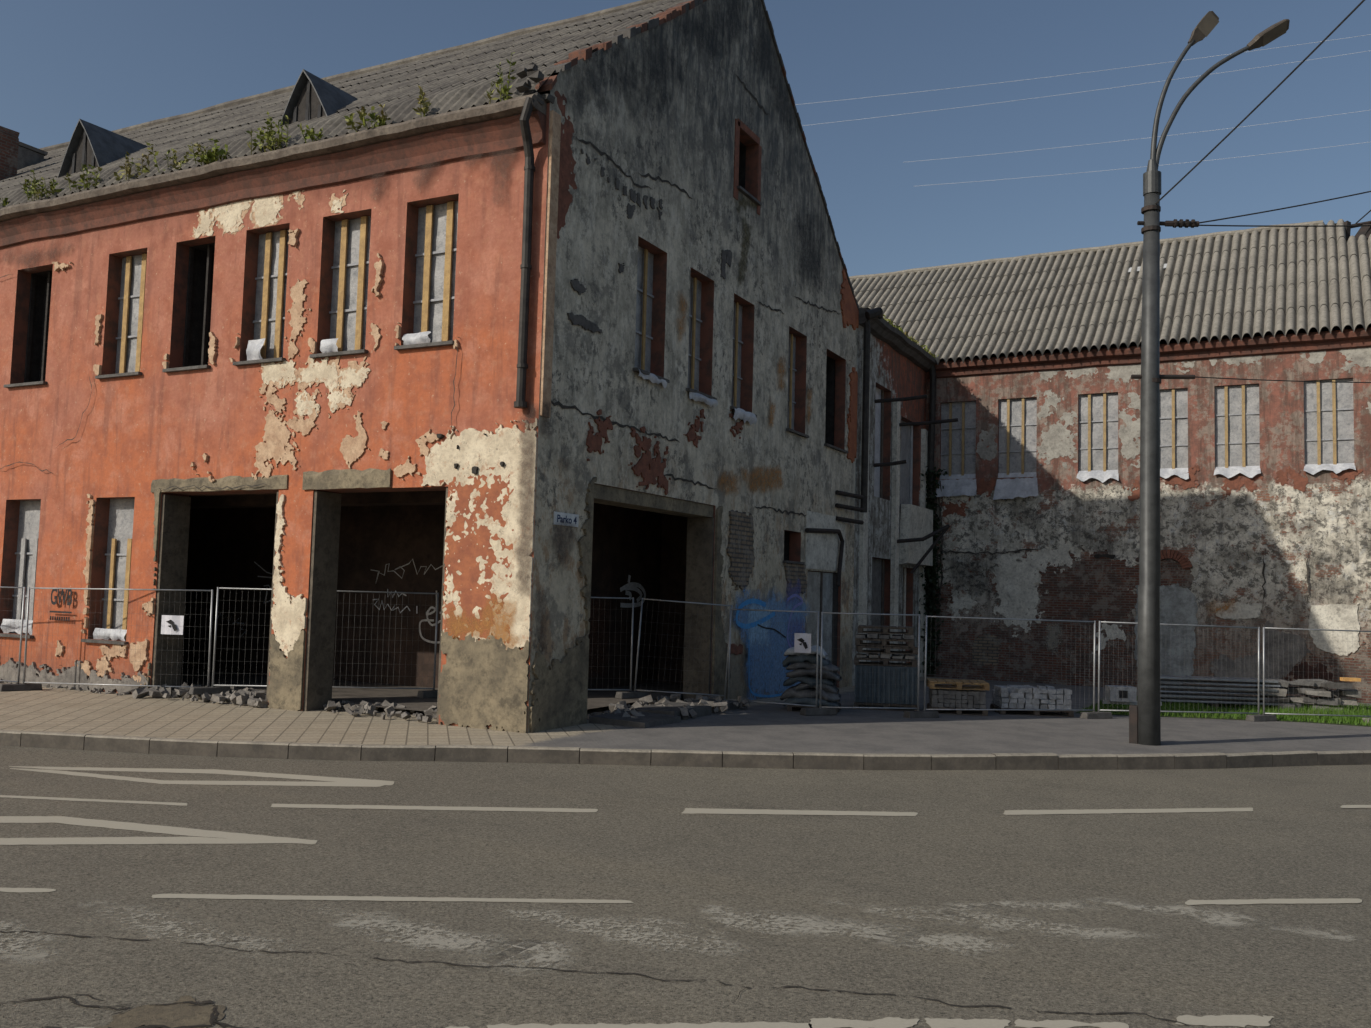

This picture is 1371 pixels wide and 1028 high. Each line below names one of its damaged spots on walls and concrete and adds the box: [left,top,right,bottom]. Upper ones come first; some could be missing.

crack [736,75,771,117]
crack [575,136,693,199]
flaking render [190,190,305,249]
peeling [208,332,240,365]
flaking render [1174,355,1262,374]
flaking render [1031,364,1141,501]
flaking render [251,279,613,733]
flaking render [1160,465,1200,490]
flaking render [1221,466,1308,497]
flaking render [1330,469,1363,485]
flaking render [926,541,1139,689]
flaking render [1209,621,1371,703]